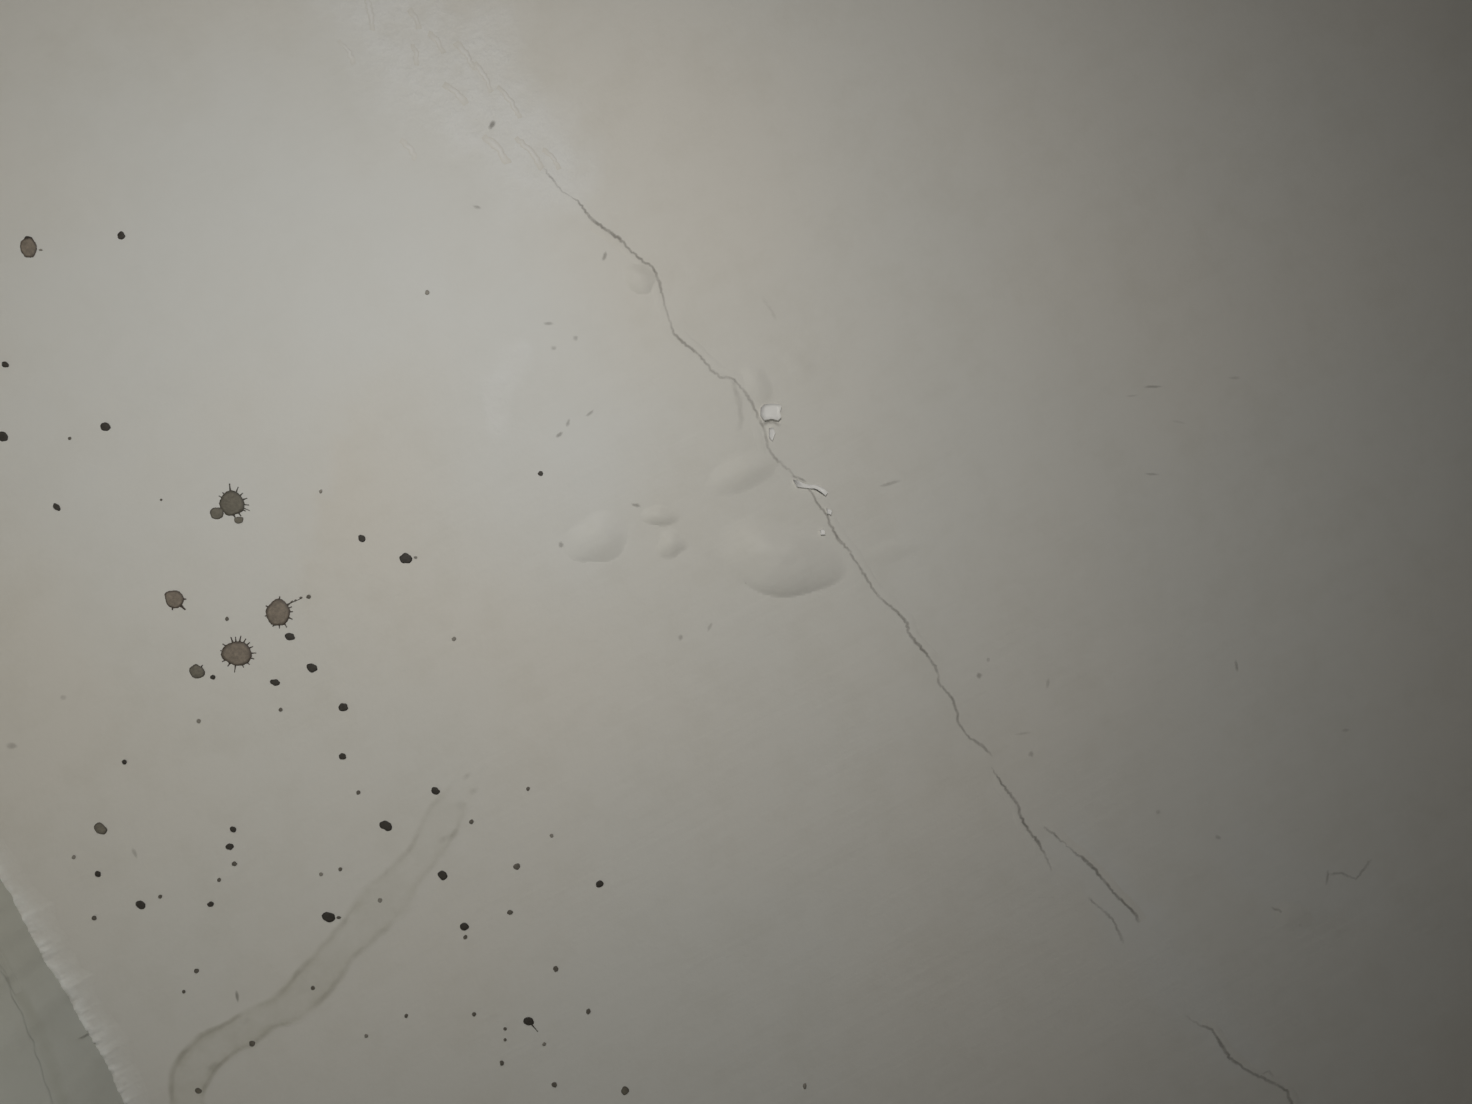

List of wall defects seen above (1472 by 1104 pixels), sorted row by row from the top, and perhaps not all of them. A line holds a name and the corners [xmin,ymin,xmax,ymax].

damp [166,757,482,1104]